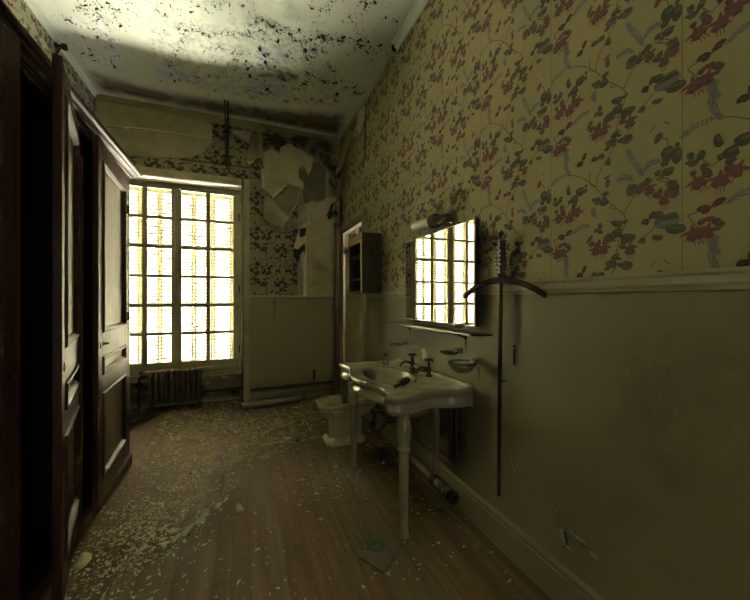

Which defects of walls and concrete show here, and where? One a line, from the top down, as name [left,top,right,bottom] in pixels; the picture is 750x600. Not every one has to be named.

damp [103,34,338,131]
flaking render [262,143,313,188]
flaking render [303,196,340,296]